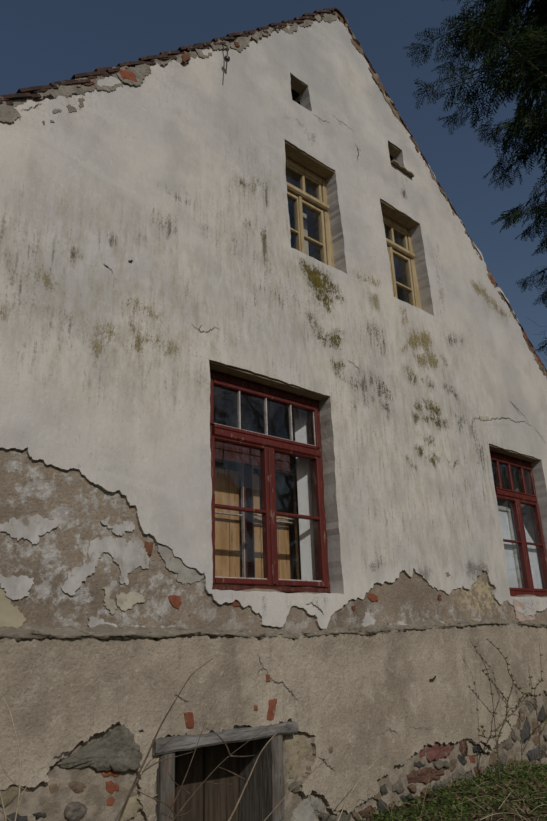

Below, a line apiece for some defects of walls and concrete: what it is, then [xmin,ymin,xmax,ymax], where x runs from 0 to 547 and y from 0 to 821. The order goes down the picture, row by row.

spalling [42,97,85,125]
crack [472,401,545,442]
flaking render [0,514,59,545]
flaking render [0,574,34,603]
flaking render [60,520,154,628]
flaking render [168,595,181,609]
flaking render [351,605,376,627]